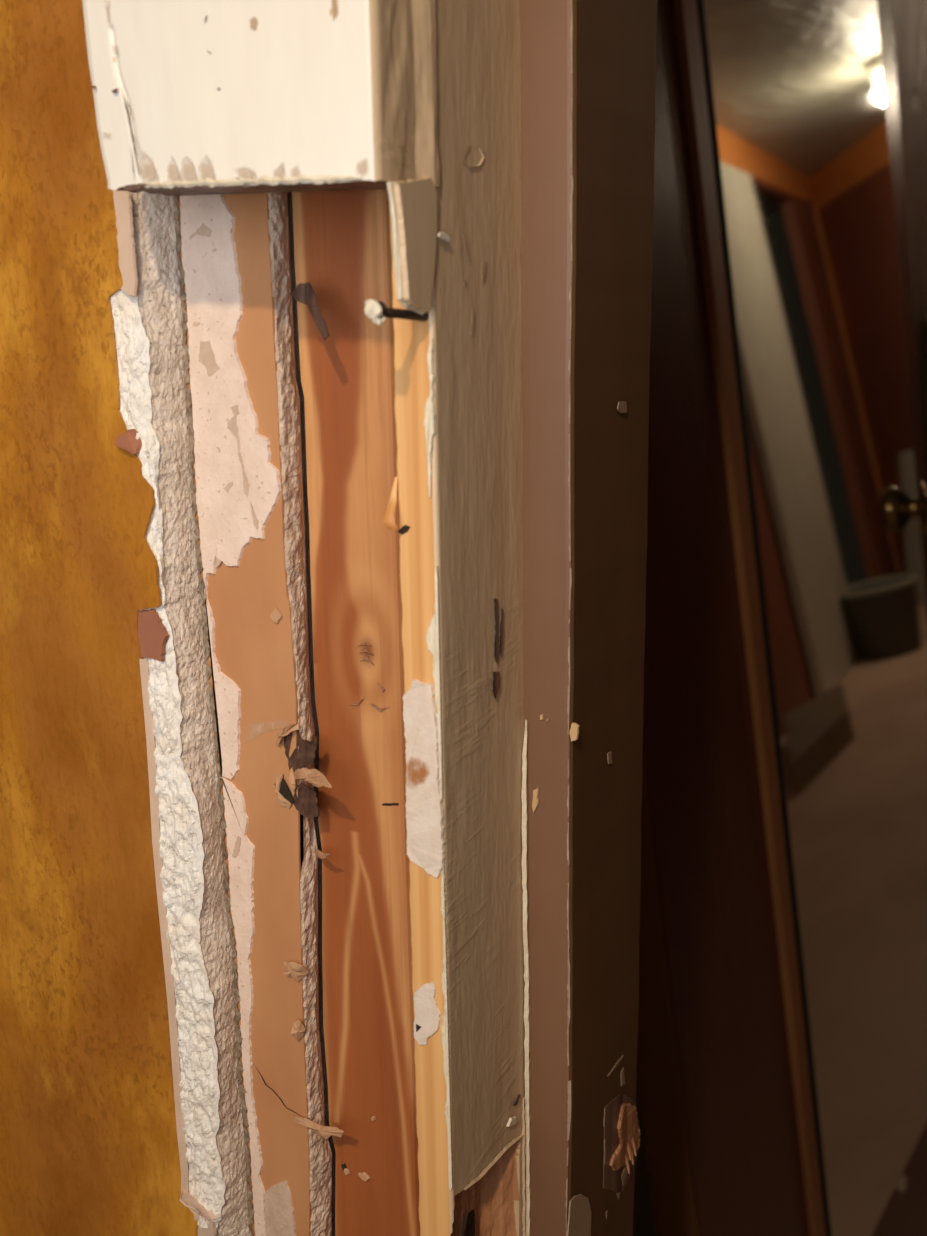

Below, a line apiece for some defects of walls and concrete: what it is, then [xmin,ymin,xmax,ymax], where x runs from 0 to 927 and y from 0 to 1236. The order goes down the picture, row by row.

spalling [110,178,344,1236]
peeling [426,566,443,800]
peeling [567,394,579,742]
peeling [617,401,627,413]
peeling [565,883,591,1236]
peeling [607,1055,625,1086]